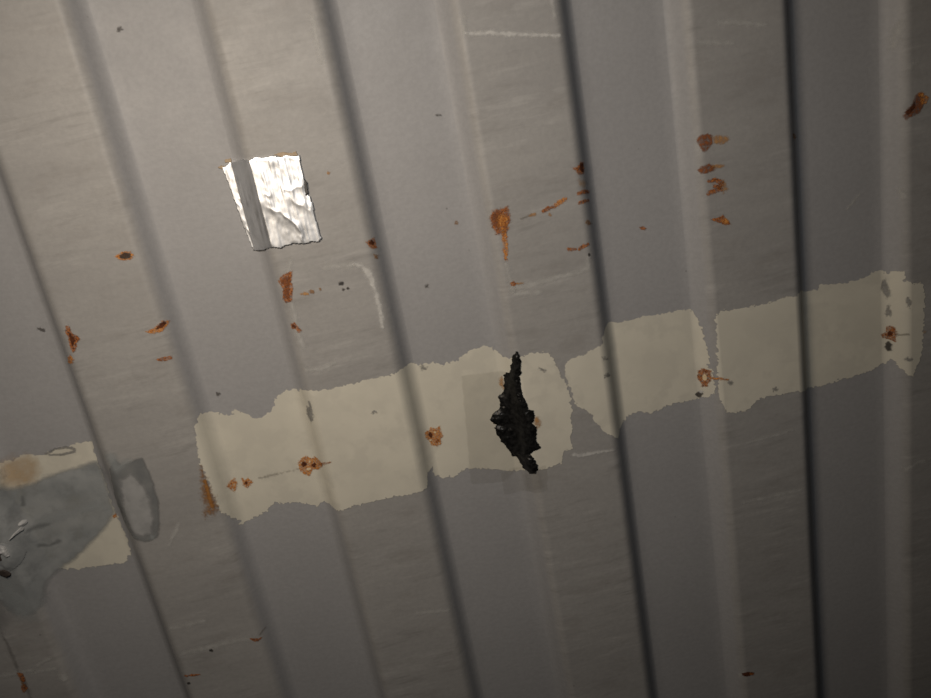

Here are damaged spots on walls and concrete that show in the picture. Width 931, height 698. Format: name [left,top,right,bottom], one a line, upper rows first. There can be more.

corrosion [904,93,929,118]
corrosion [697,134,728,151]
corrosion [698,164,727,195]
corrosion [490,207,510,259]
corrosion [278,272,321,303]
corrosion [66,326,79,364]
corrosion [882,326,896,351]
corrosion [697,369,732,386]
peeling [194,270,926,525]
corrosion [425,427,443,446]
corrosion [299,456,330,476]
peeling [0,441,131,570]